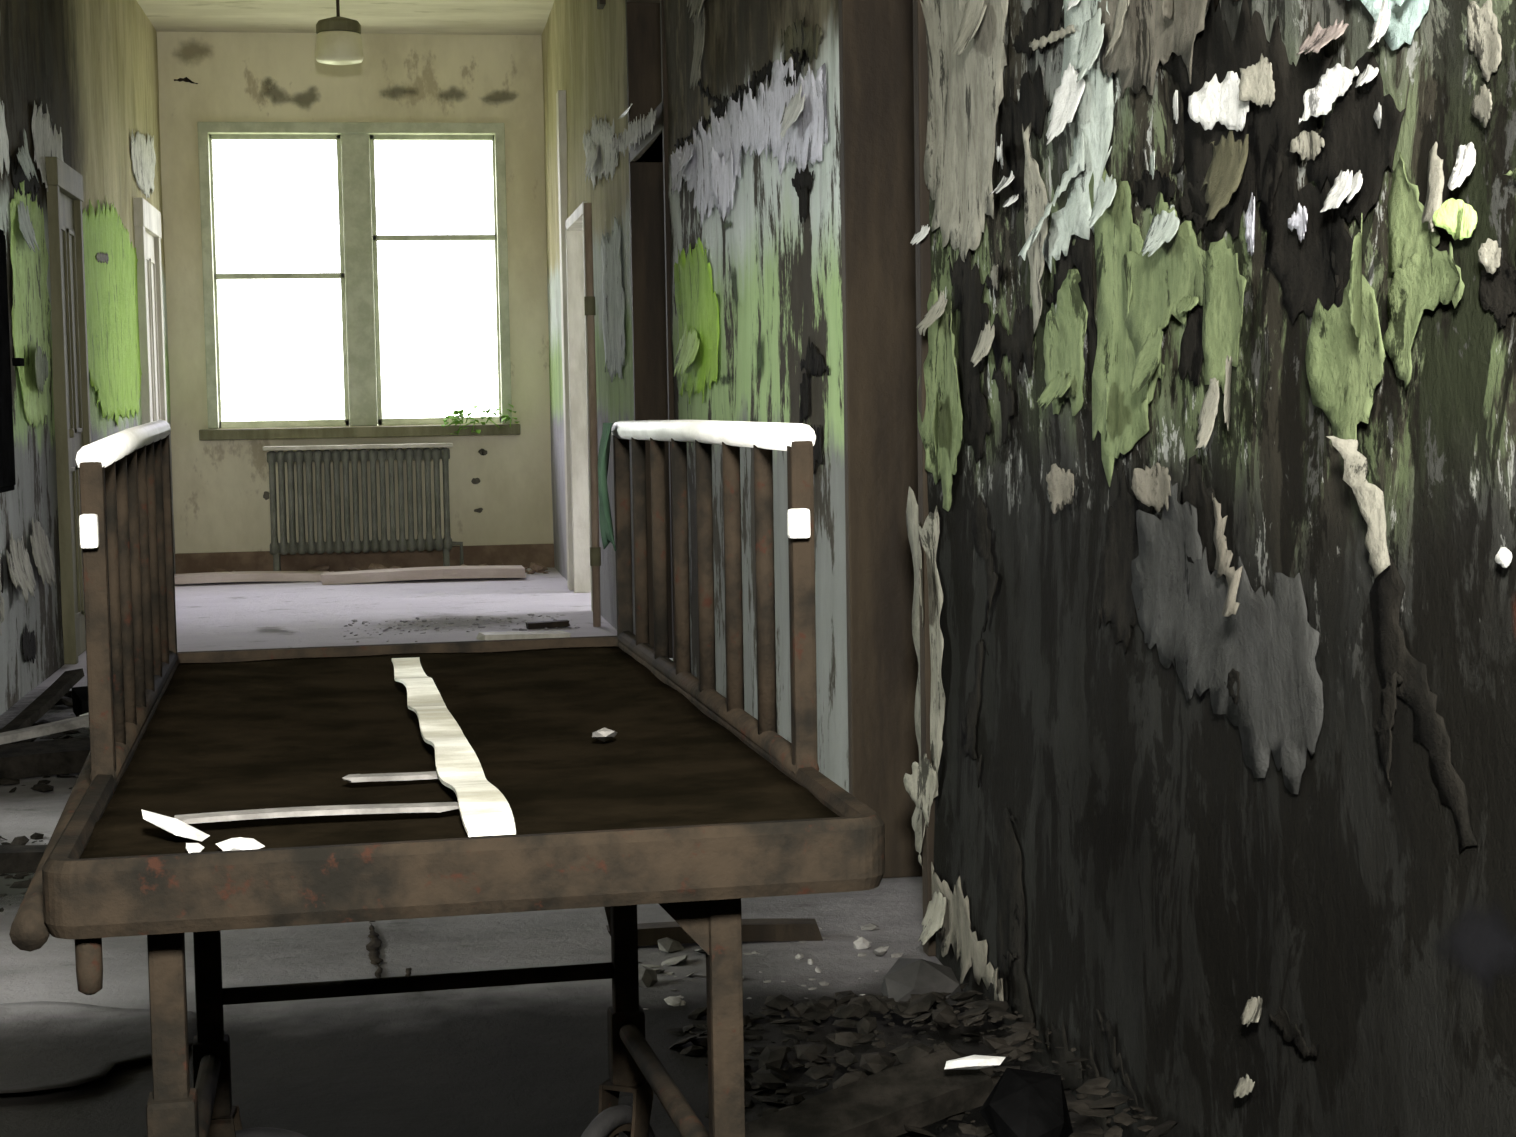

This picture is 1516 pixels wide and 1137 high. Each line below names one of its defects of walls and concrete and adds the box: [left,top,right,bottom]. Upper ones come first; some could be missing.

peeling [0,99,64,429]
peeling [82,195,142,426]
water stain [265,79,316,106]
water stain [383,88,414,98]
water stain [442,89,464,98]
water stain [486,92,515,101]
peeling [601,217,625,383]
peeling [583,104,656,190]
peeling [670,17,828,404]
flaking render [799,338,829,473]
peeling [903,0,1516,1001]
peeling [0,518,55,636]